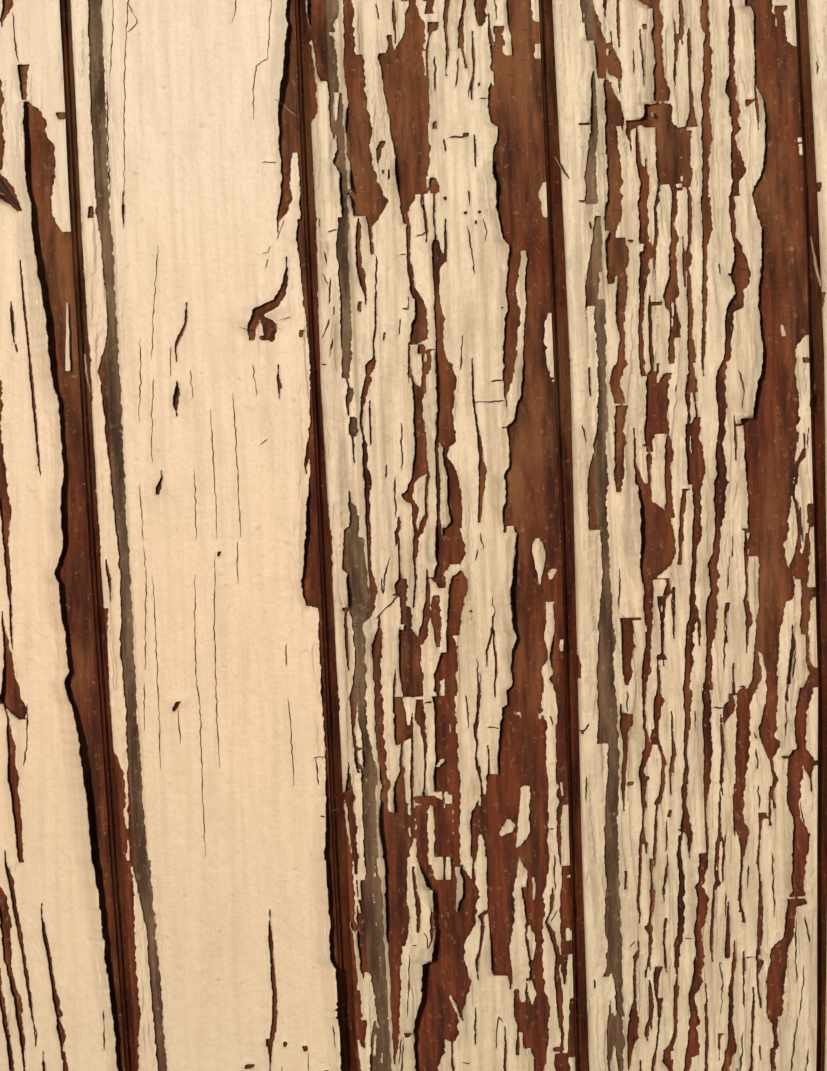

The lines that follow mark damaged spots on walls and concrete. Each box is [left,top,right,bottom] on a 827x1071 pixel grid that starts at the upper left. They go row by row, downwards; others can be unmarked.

peeling [0,0,167,1071]
peeling [244,0,582,1071]
peeling [579,0,822,1071]